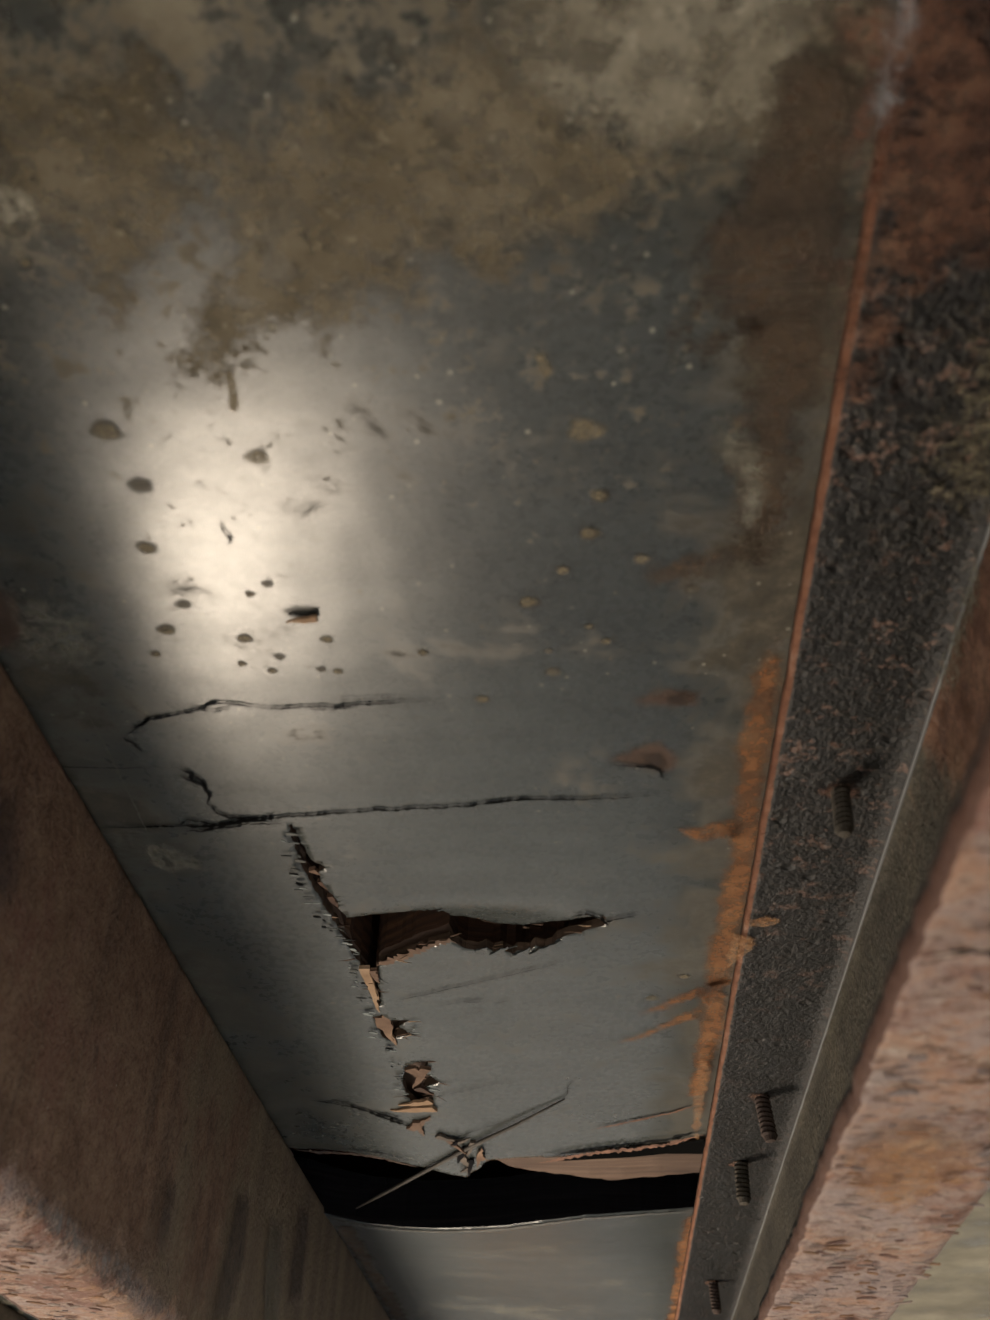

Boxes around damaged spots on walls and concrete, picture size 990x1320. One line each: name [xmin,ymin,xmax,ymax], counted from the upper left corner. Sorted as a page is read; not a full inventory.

leakage [634,50,857,593]
crack [122,700,437,753]
crack [104,767,663,832]
corrosion [626,657,781,1139]
crack [298,1150,419,1168]
crack [312,1100,502,1137]
crack [536,1106,705,1164]